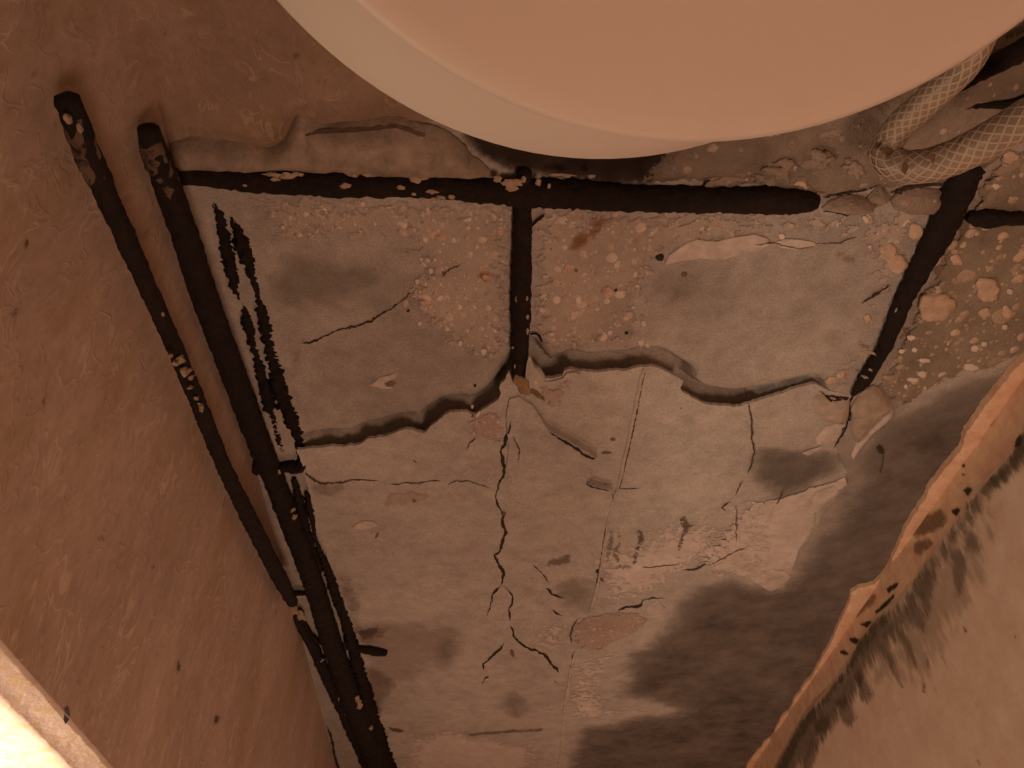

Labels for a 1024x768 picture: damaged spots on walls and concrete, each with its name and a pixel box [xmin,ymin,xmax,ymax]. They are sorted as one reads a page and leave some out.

peeling [170,83,924,194]
spalling [903,62,1024,150]
spalling [990,29,1024,55]
crack [303,288,418,344]
spalling [248,195,513,365]
spalling [530,208,924,353]
spalling [851,150,1024,459]
crack [819,391,853,448]
crack [305,422,563,685]
water stain [563,381,1024,768]